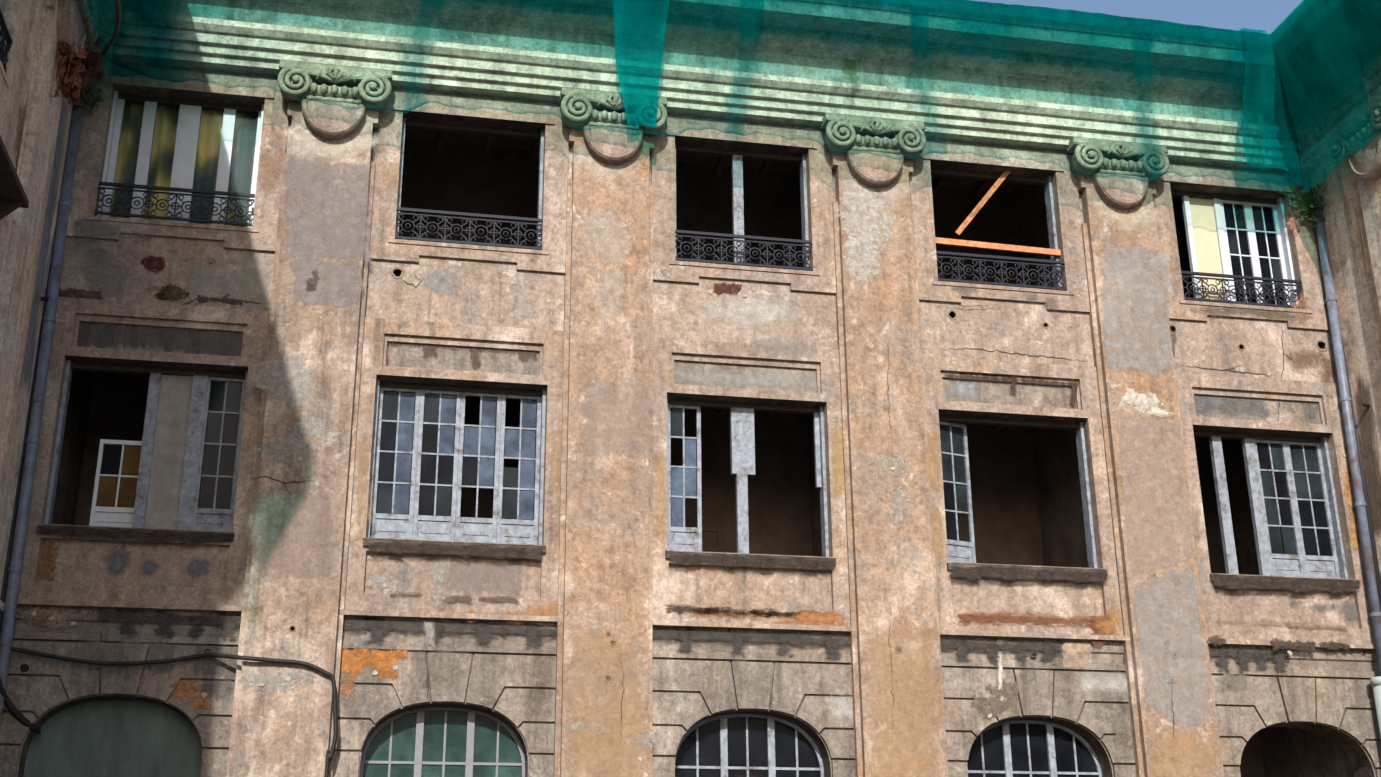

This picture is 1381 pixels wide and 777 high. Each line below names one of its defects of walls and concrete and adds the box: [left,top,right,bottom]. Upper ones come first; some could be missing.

spalling [708,282,747,297]
peeling [1118,388,1173,417]
spalling [37,539,62,582]
spalling [338,648,409,700]
spalling [171,677,214,712]